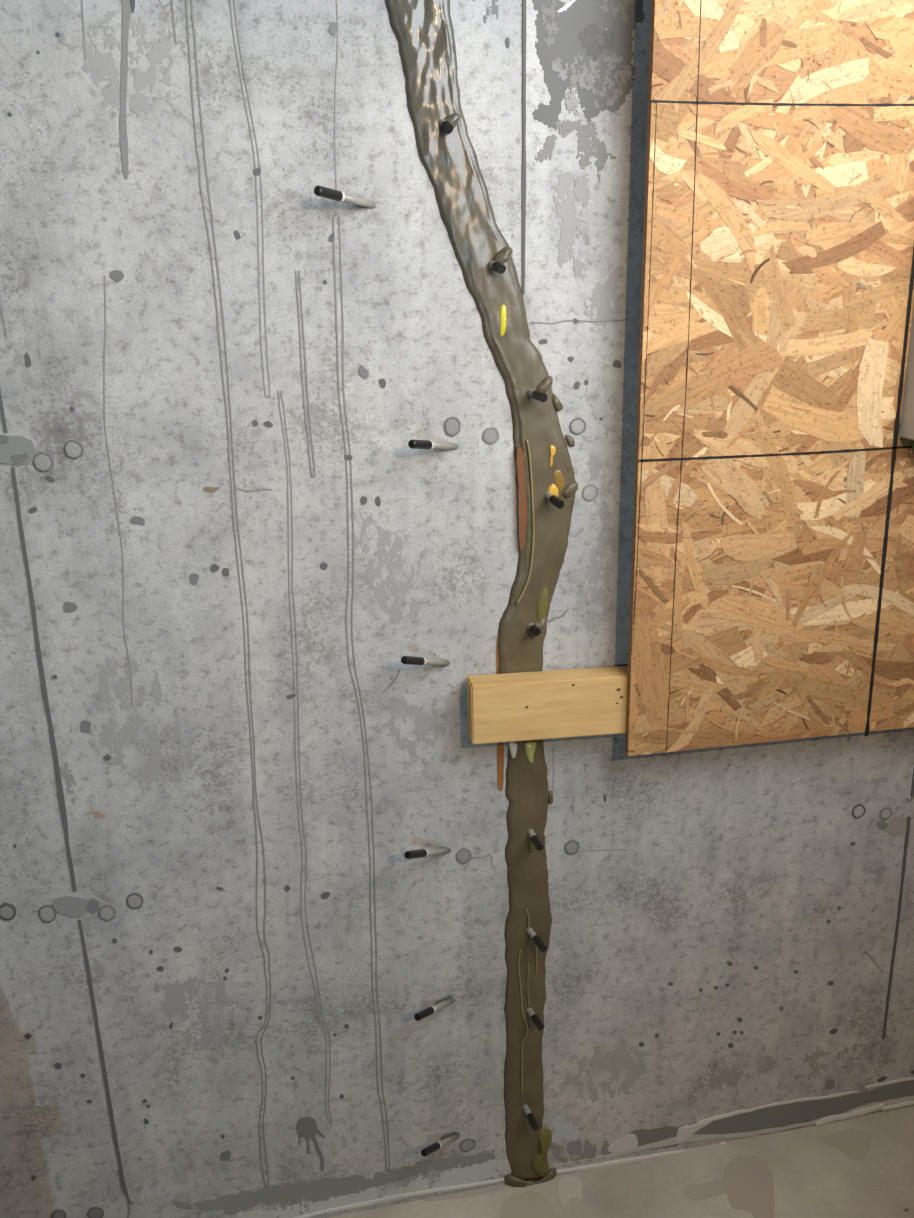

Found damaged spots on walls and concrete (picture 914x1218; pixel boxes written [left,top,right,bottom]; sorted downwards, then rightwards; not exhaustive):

damp [532,0,645,277]
damp [584,264,624,328]
damp [81,0,560,1218]
crack [382,669,400,693]
peeling [551,1096,914,1167]